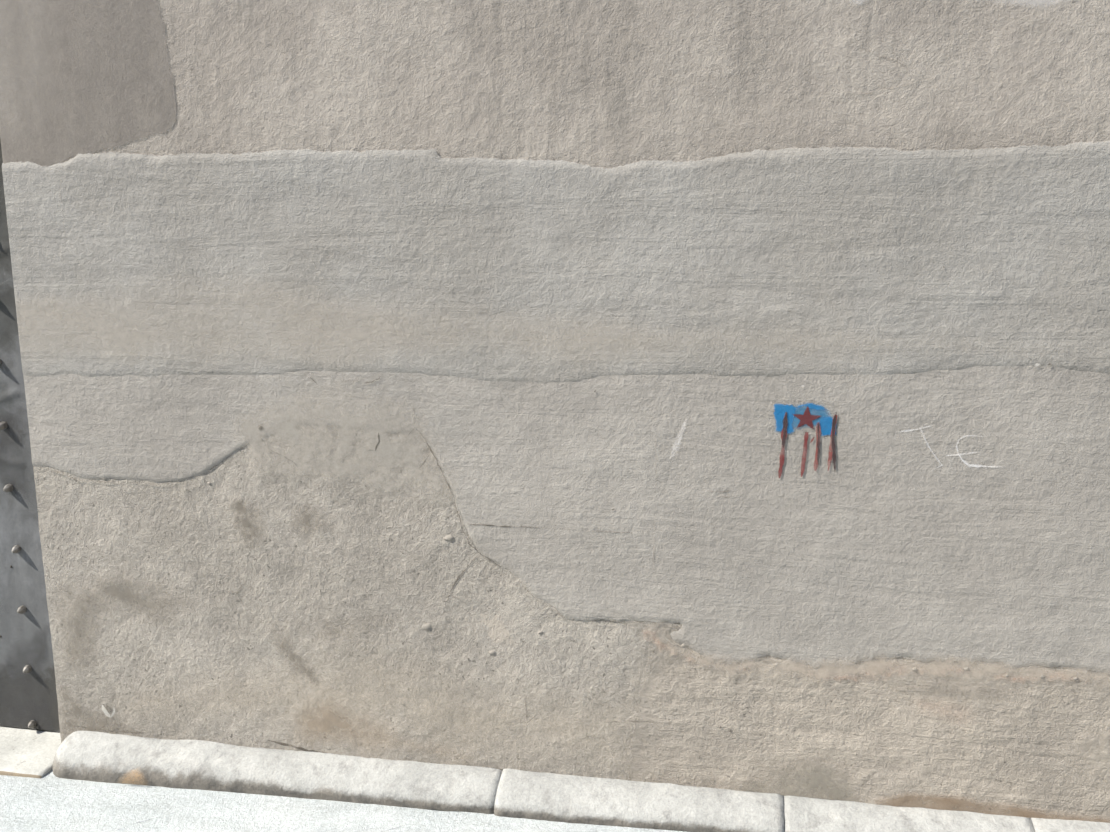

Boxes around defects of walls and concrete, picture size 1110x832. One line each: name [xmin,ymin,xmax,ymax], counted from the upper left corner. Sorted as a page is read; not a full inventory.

crack [409,409,542,602]